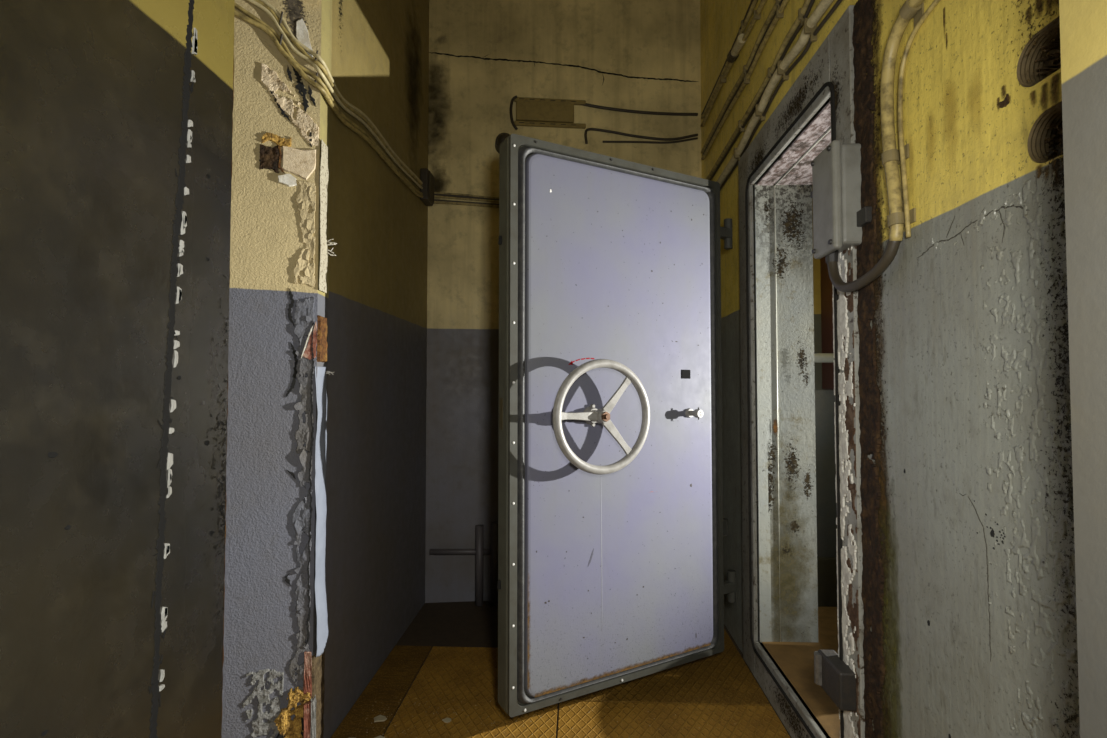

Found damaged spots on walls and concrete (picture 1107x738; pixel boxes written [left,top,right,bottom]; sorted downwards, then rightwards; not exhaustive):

crack [149,0,230,738]
flaking render [242,63,337,738]
crack [285,288,314,645]
rust [317,315,328,363]
crack [429,52,698,85]
rust [745,0,897,738]
crack [918,193,1027,258]
damp [997,0,1061,106]